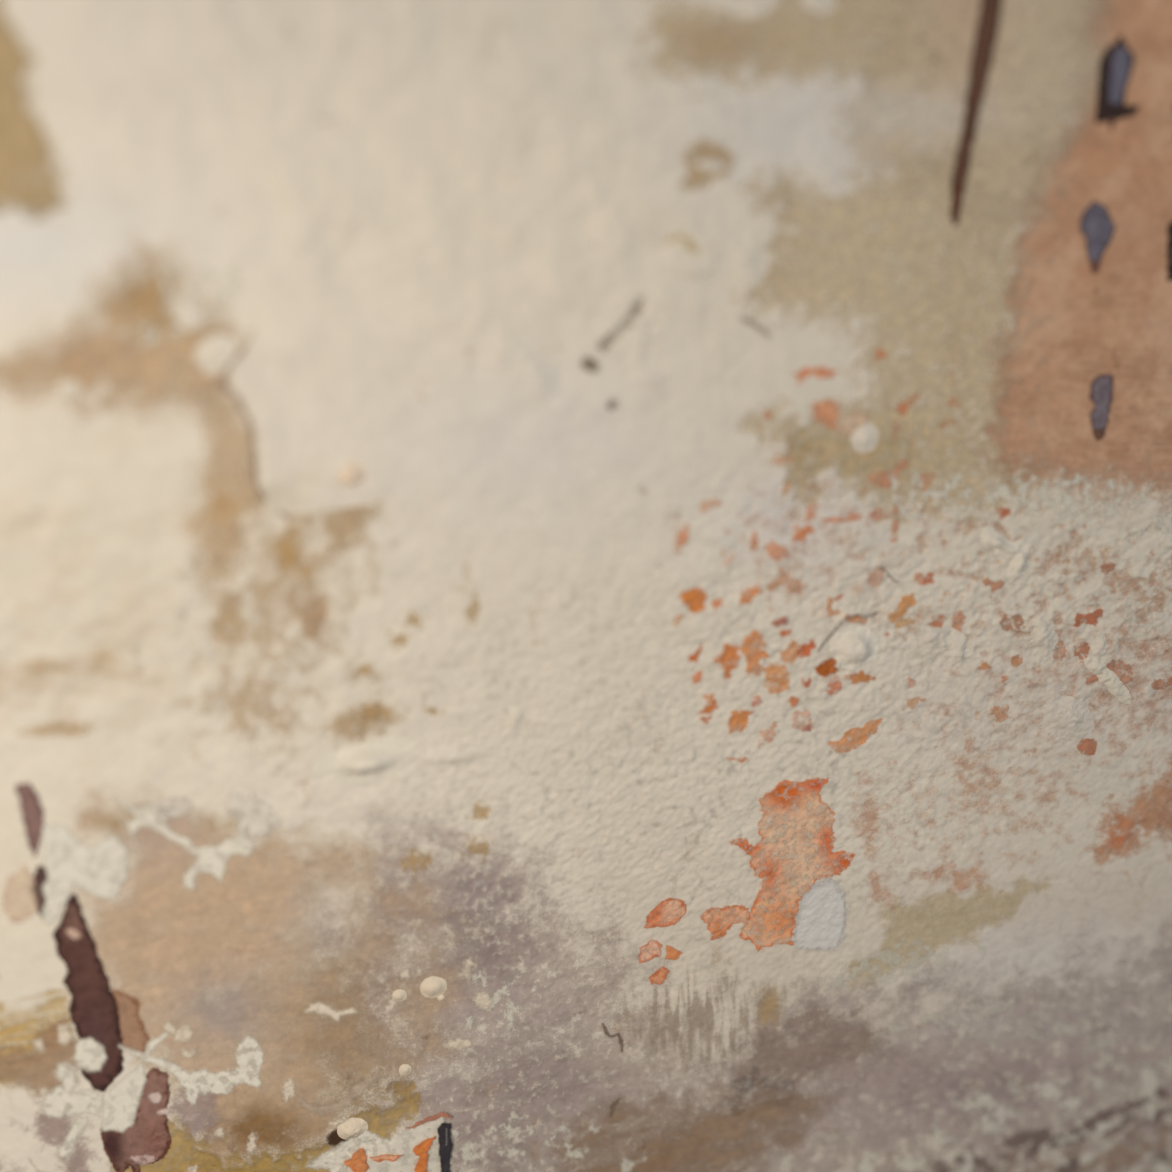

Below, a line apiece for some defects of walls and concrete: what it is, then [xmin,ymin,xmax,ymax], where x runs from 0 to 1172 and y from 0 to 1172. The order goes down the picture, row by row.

peeling [0,9,63,219]
peeling [307,1112,453,1172]